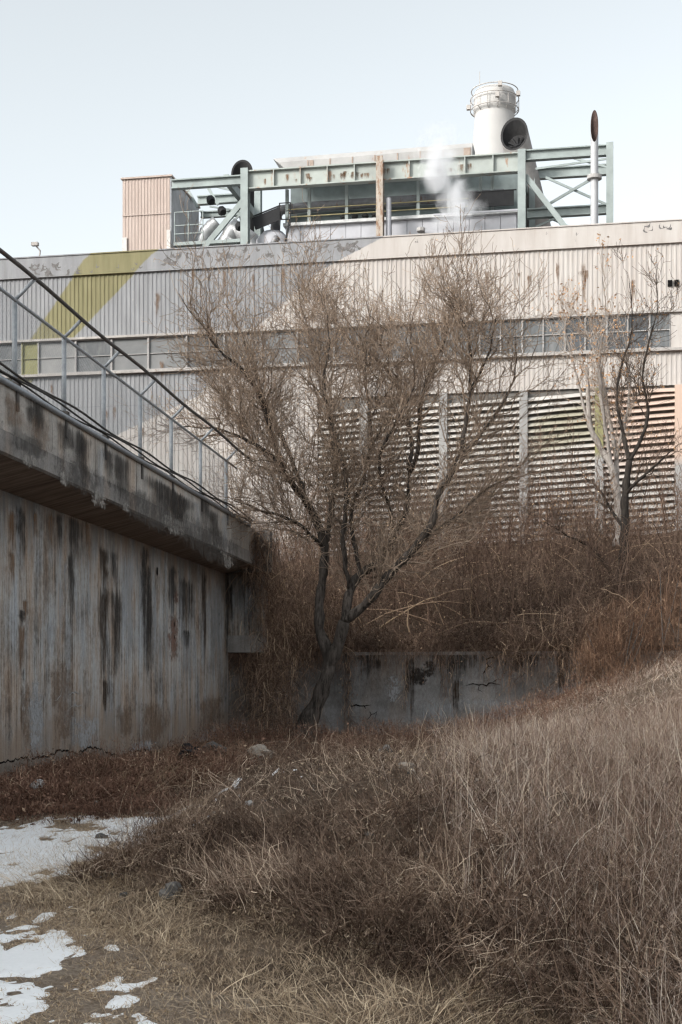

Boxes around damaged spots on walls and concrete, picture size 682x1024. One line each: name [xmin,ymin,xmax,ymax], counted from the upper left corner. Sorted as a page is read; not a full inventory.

leakage [29,400,47,430]
leakage [60,421,131,490]
leakage [148,477,227,541]
leakage [47,515,256,714]
leakage [406,655,532,725]
crack [466,656,497,692]
crack [0,746,152,764]